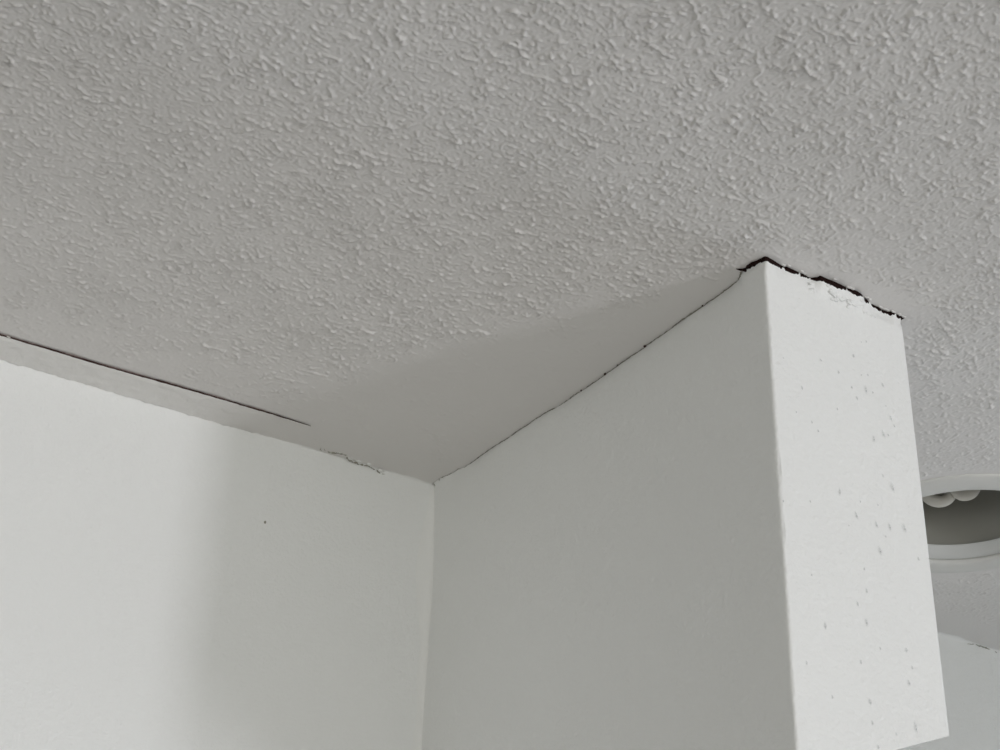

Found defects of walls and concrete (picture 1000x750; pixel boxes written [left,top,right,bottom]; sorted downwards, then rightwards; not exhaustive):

crack [0,334,310,426]
crack [434,256,906,486]
crack [320,449,384,473]